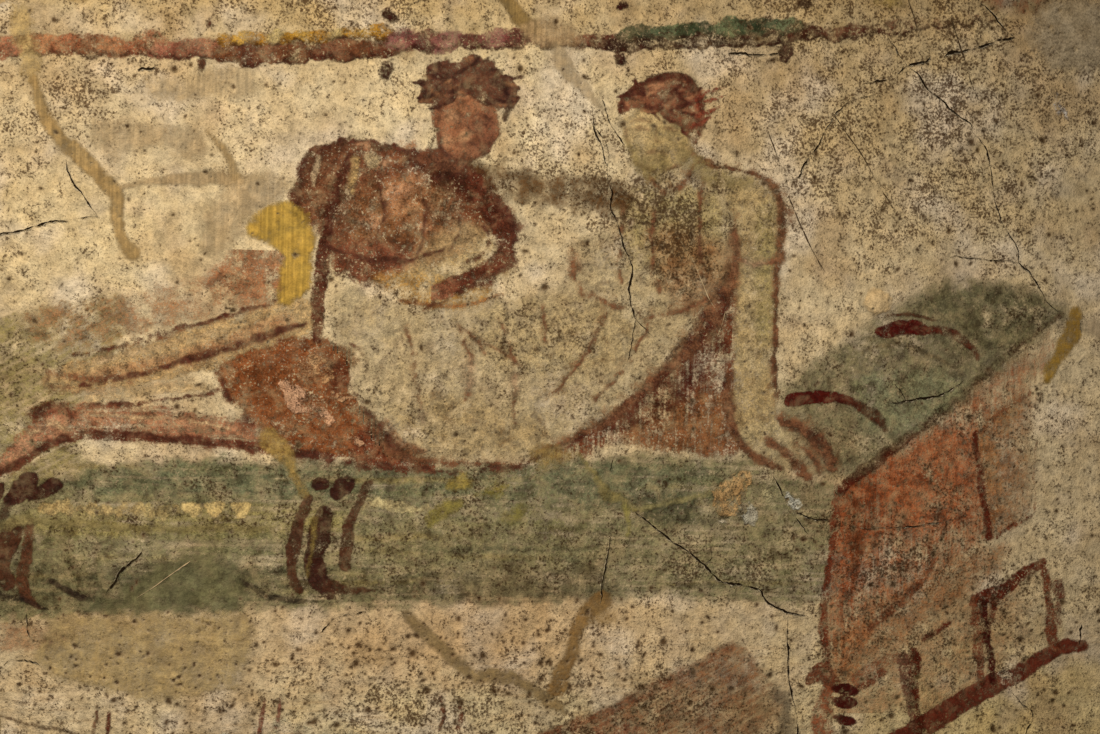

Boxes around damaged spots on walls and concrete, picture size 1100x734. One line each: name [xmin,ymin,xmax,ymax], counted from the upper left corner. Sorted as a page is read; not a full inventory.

crack [0,75,244,259]
crack [500,0,649,359]
crack [781,3,1060,313]
crack [0,517,275,591]
crack [579,445,805,734]